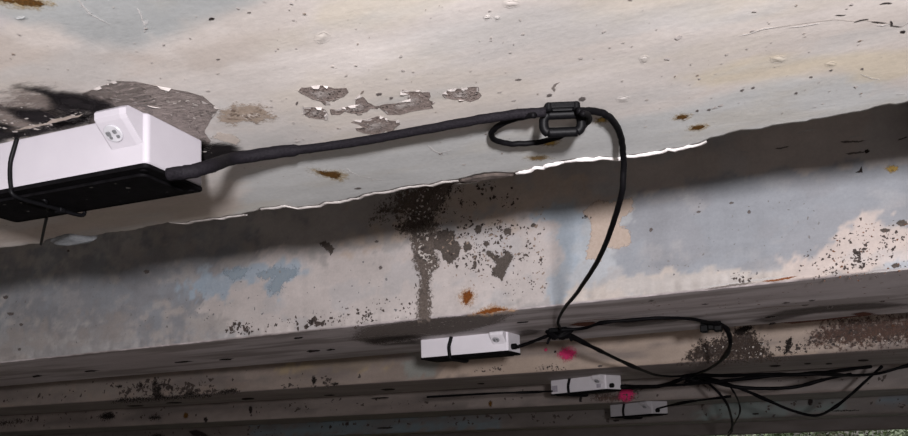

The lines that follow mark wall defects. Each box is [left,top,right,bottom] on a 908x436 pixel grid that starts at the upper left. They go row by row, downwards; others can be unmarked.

corrosion [0,0,54,9]
spalling [82,81,276,151]
peeling [296,85,482,135]
corrosion [313,169,346,180]
peeling [582,197,634,260]
water stain [225,181,547,335]
corrosion [458,290,514,314]